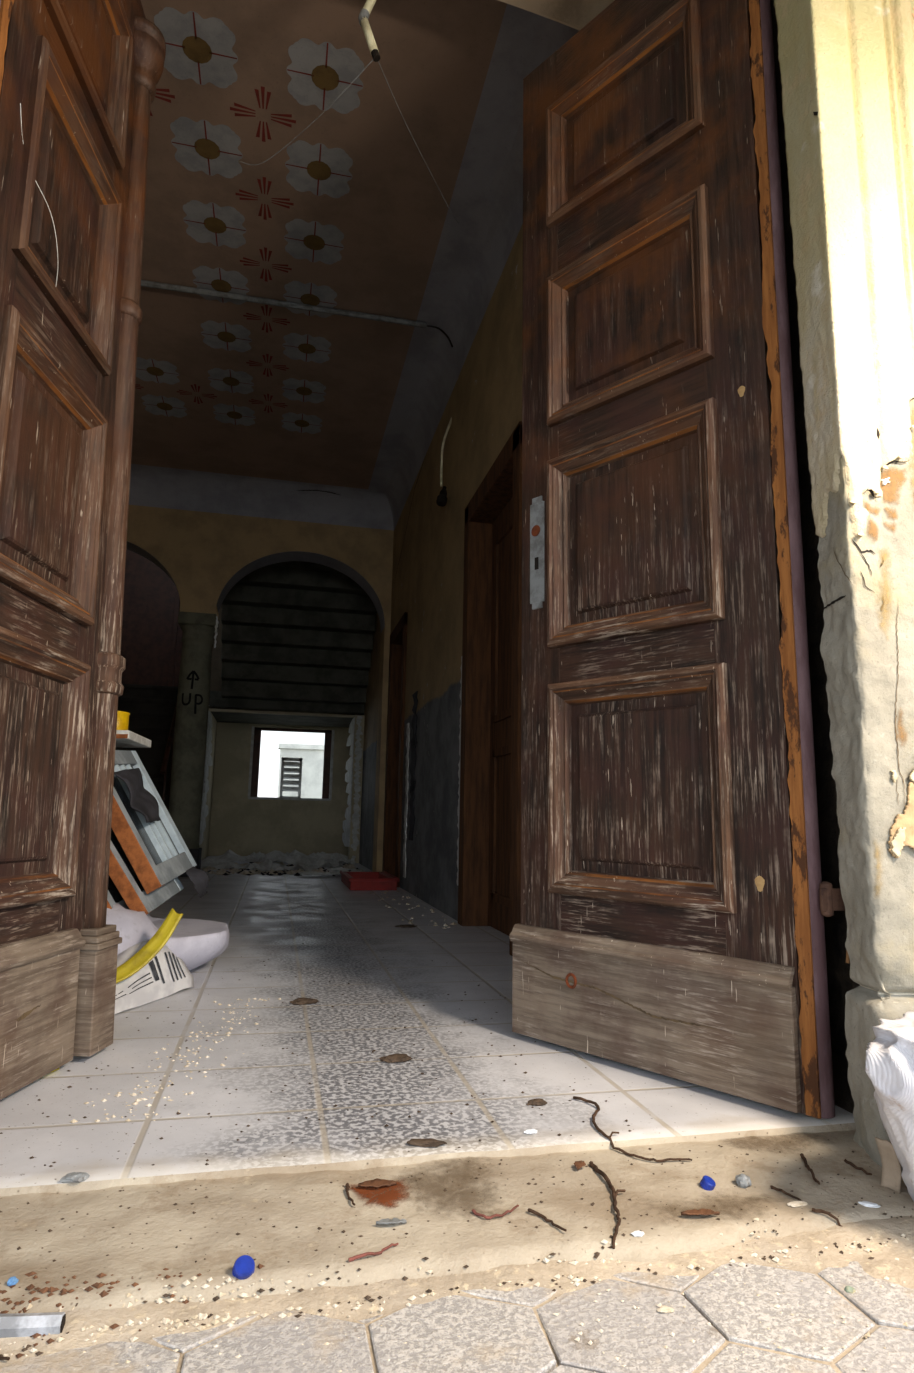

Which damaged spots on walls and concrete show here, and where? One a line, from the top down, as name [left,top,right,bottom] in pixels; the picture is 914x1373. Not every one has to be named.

flaking render [818,398,914,1167]